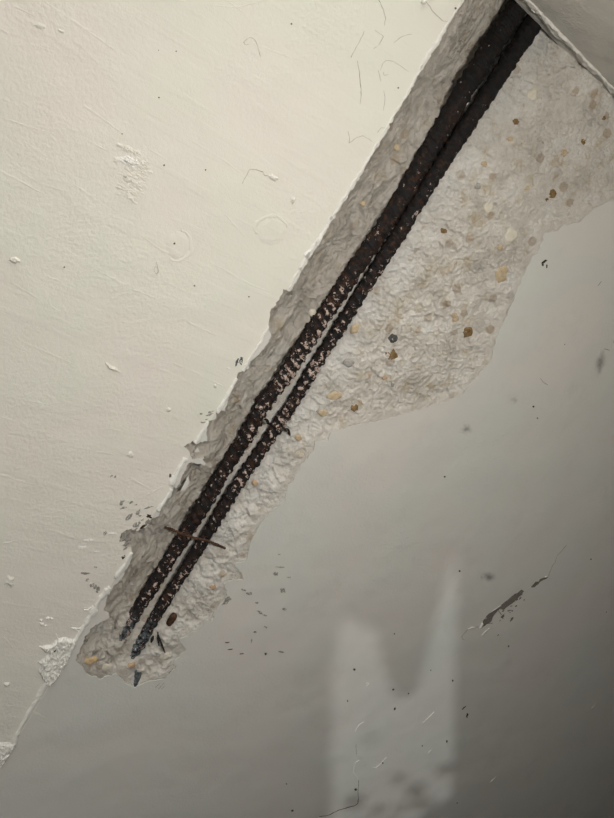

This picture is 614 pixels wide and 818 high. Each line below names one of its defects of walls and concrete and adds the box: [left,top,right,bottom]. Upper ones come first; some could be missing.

spalling [76,0,614,686]